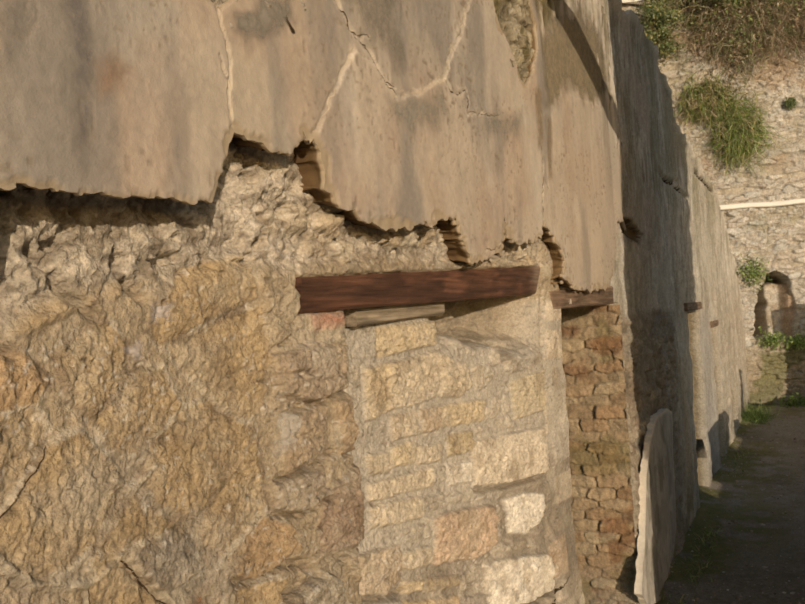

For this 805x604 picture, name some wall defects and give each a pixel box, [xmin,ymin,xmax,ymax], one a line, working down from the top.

crack [313,0,497,132]
crack [25,445,46,484]
crack [120,560,166,604]